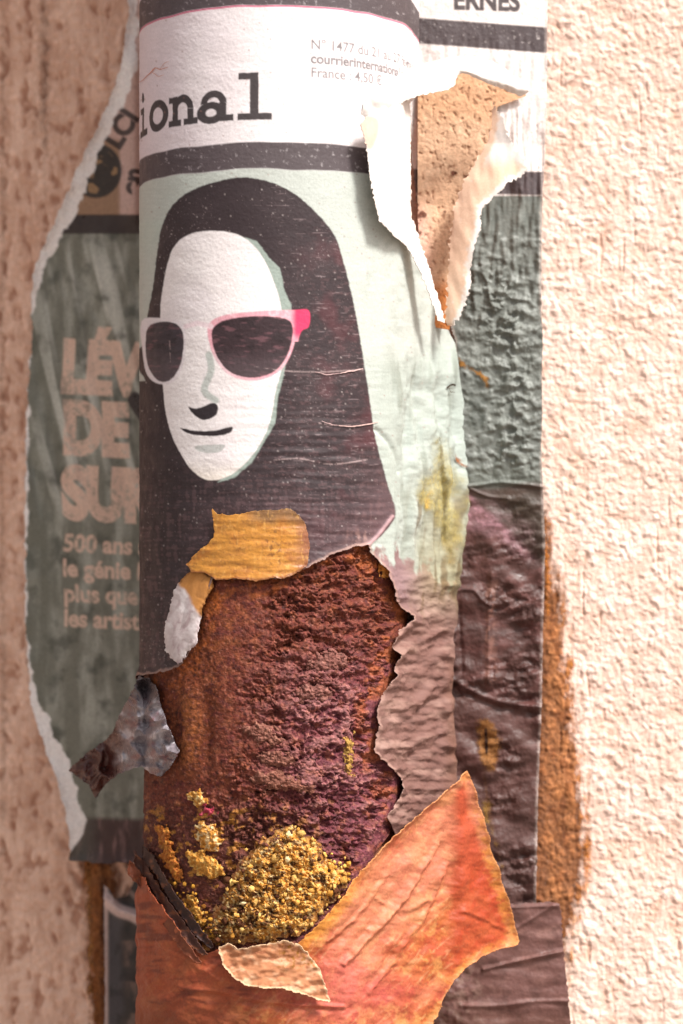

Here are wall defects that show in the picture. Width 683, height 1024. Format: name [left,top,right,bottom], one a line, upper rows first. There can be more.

rust [143,545,408,953]